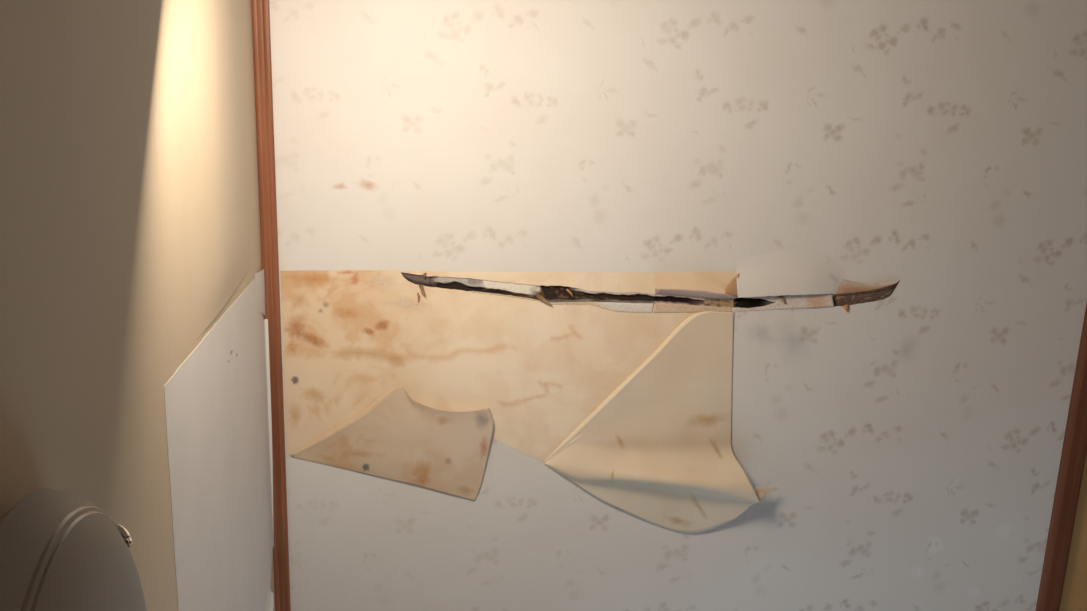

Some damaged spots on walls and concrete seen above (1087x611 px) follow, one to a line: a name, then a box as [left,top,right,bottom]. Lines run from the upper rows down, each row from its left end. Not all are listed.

crack [401,249,900,313]